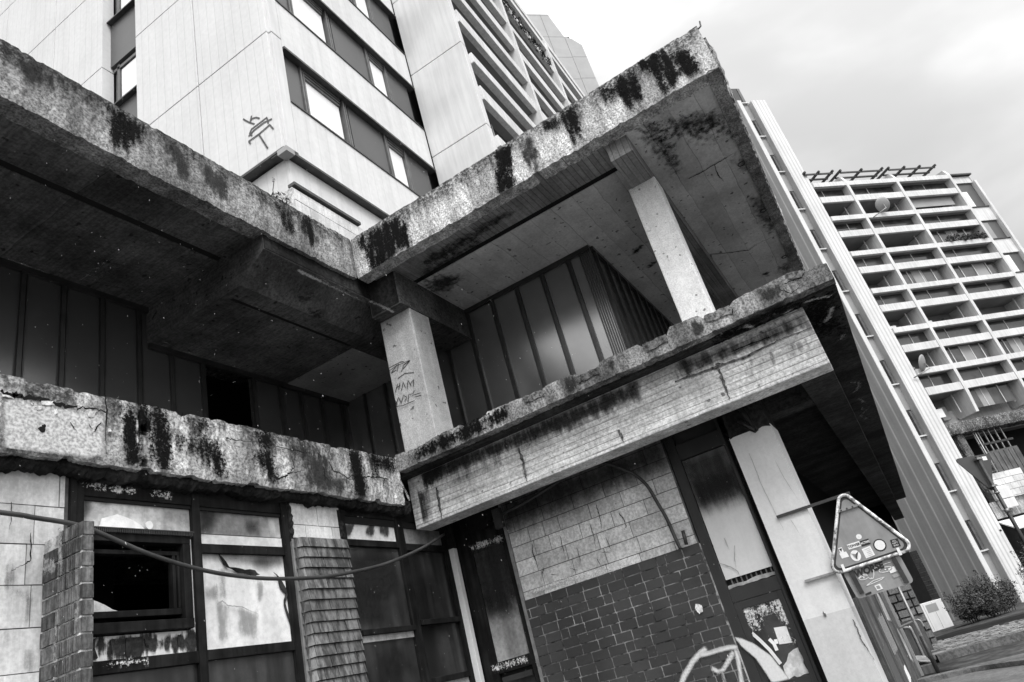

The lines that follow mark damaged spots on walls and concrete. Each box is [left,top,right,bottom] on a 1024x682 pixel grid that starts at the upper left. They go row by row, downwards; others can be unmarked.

damp [599,46,702,112]
damp [102,102,146,155]
damp [541,105,581,145]
damp [172,146,228,199]
damp [492,137,544,193]
damp [276,203,319,246]
damp [358,216,413,270]
damp [117,400,229,478]
damp [250,429,280,484]
crack [268,446,392,487]
damp [295,382,639,521]
crack [9,502,32,571]